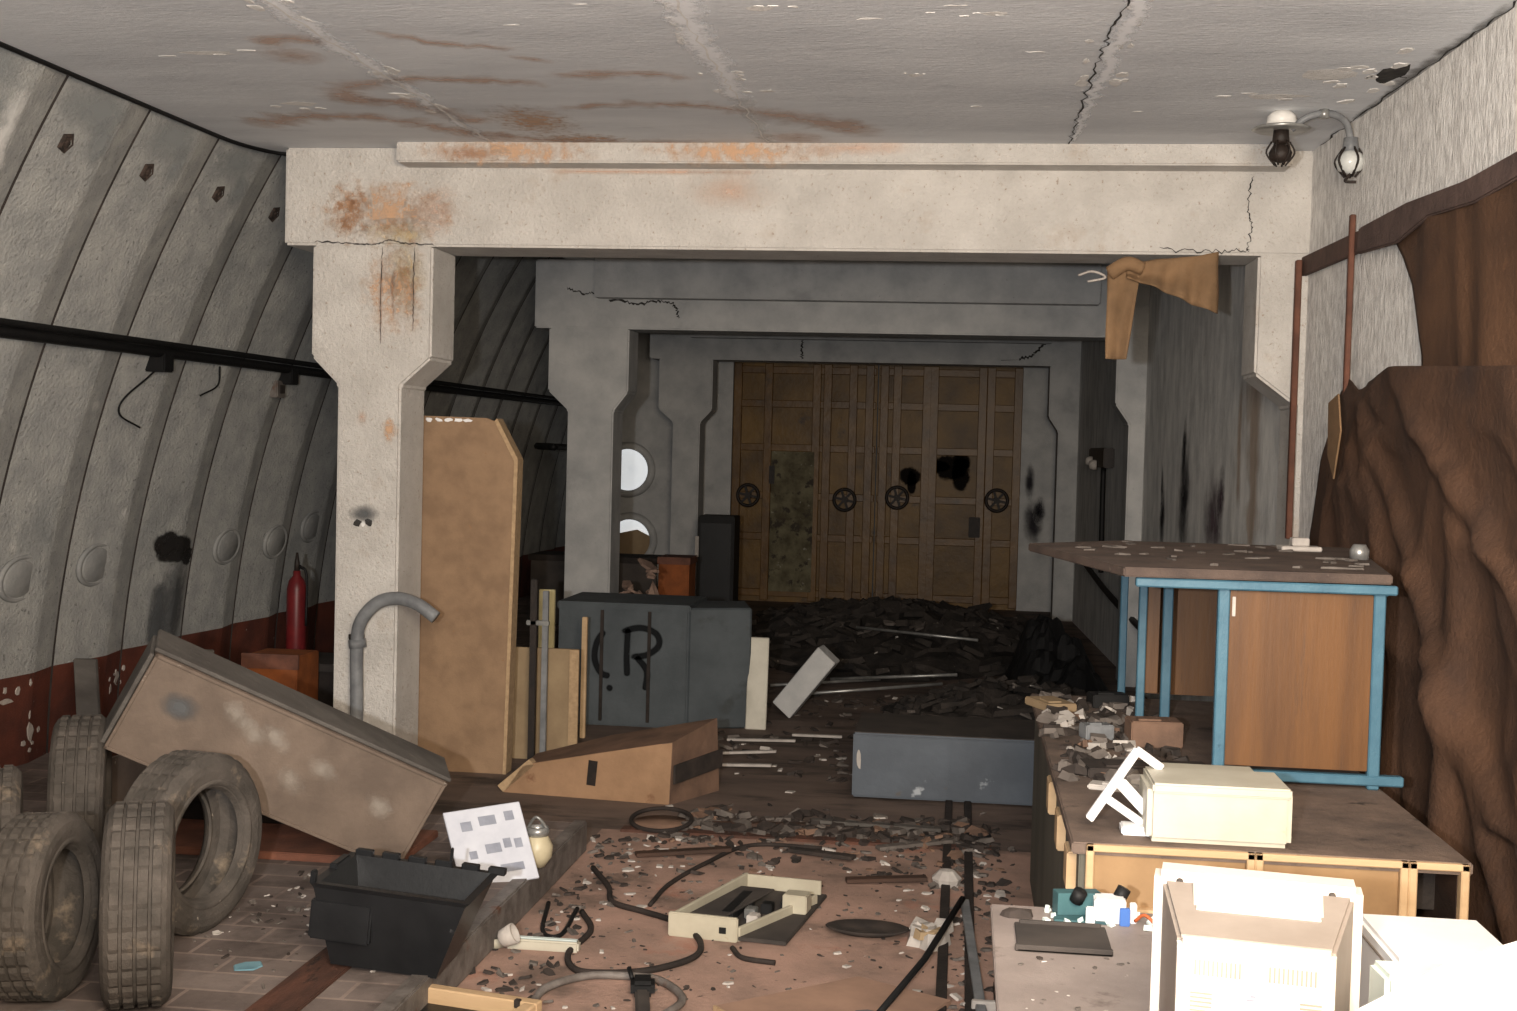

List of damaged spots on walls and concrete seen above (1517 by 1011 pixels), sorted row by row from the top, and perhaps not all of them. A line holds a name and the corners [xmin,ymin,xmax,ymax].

crack [244,0,494,143]
crack [656,0,776,143]
crack [1068,0,1154,144]
spalling [1216,12,1503,116]
corrosion [429,111,615,163]
corrosion [338,183,417,236]
crack [1160,177,1253,254]
crack [567,288,679,317]